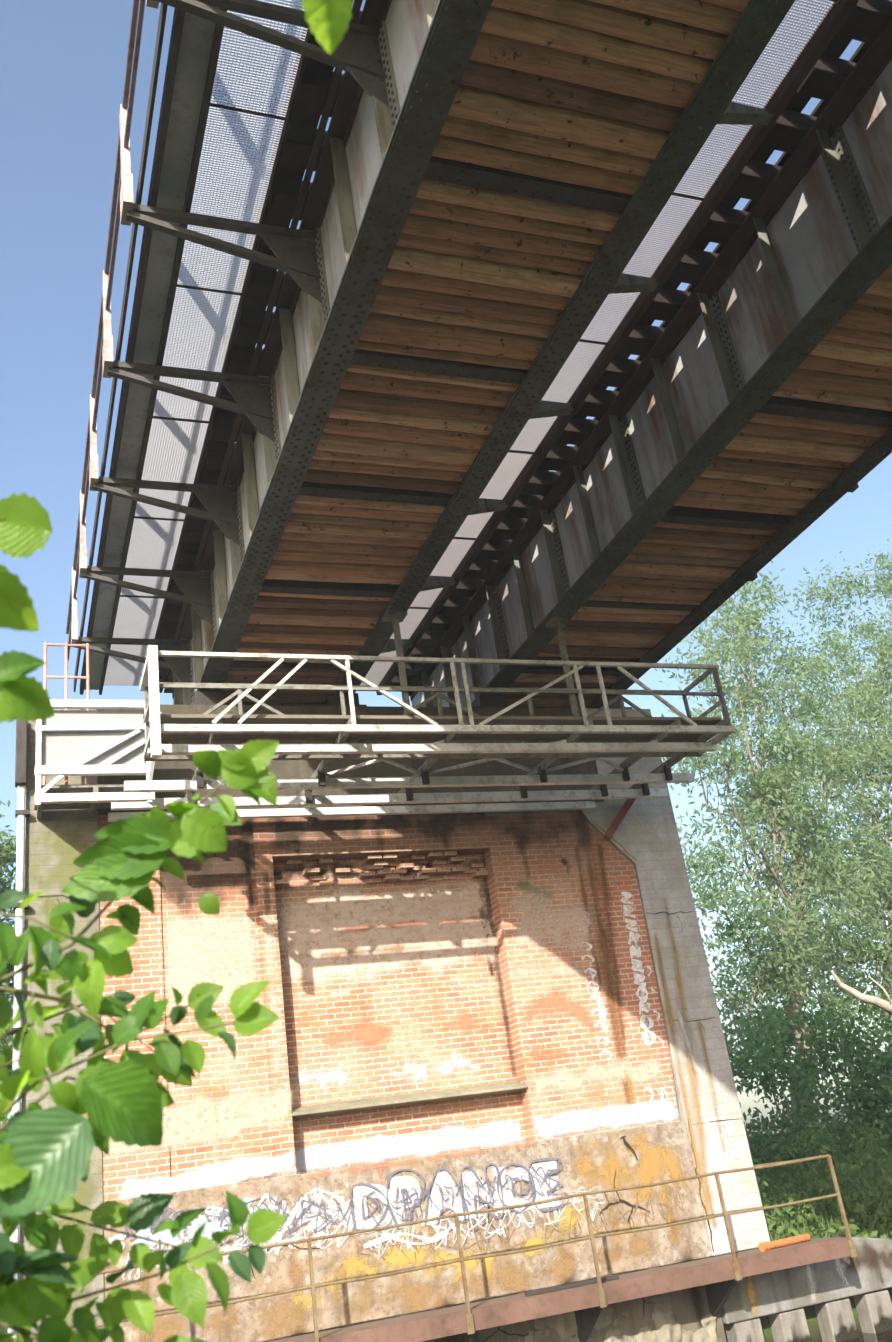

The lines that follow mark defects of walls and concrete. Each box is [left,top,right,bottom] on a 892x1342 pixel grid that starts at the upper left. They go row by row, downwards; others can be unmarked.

peeling [168,918,254,1006]
peeling [269,851,494,996]
corrosion [656,936,716,1227]
crack [600,1170,650,1230]
corrosion [577,1136,683,1202]
water stain [690,1286,703,1328]